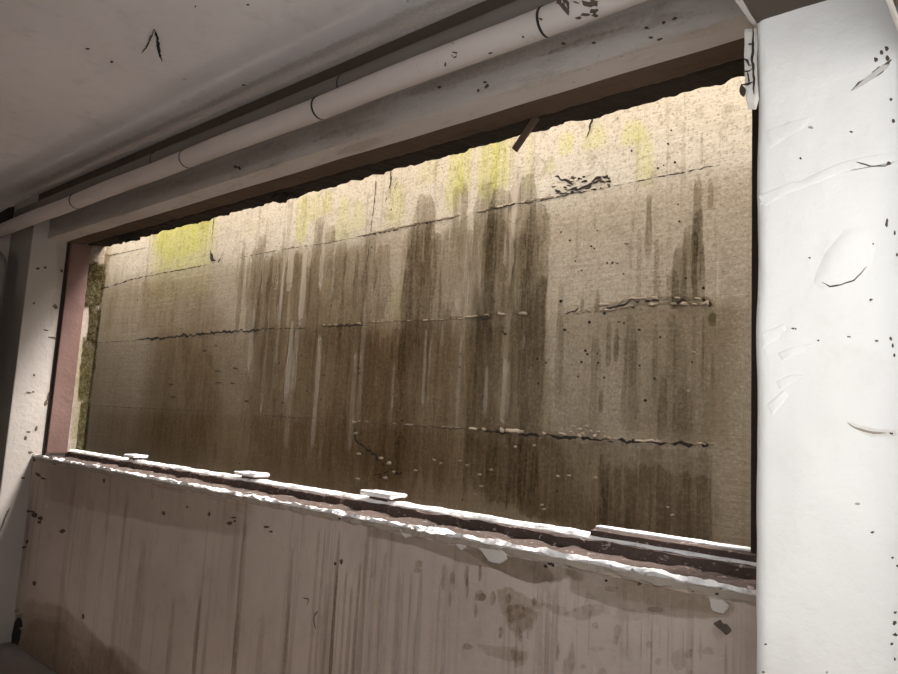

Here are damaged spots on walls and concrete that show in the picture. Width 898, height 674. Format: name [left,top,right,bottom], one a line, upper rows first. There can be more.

crack [142,29,162,61]
crack [852,46,892,90]
spalling [552,175,612,195]
spalling [565,286,715,324]
crack [97,311,531,343]
crack [351,420,713,482]